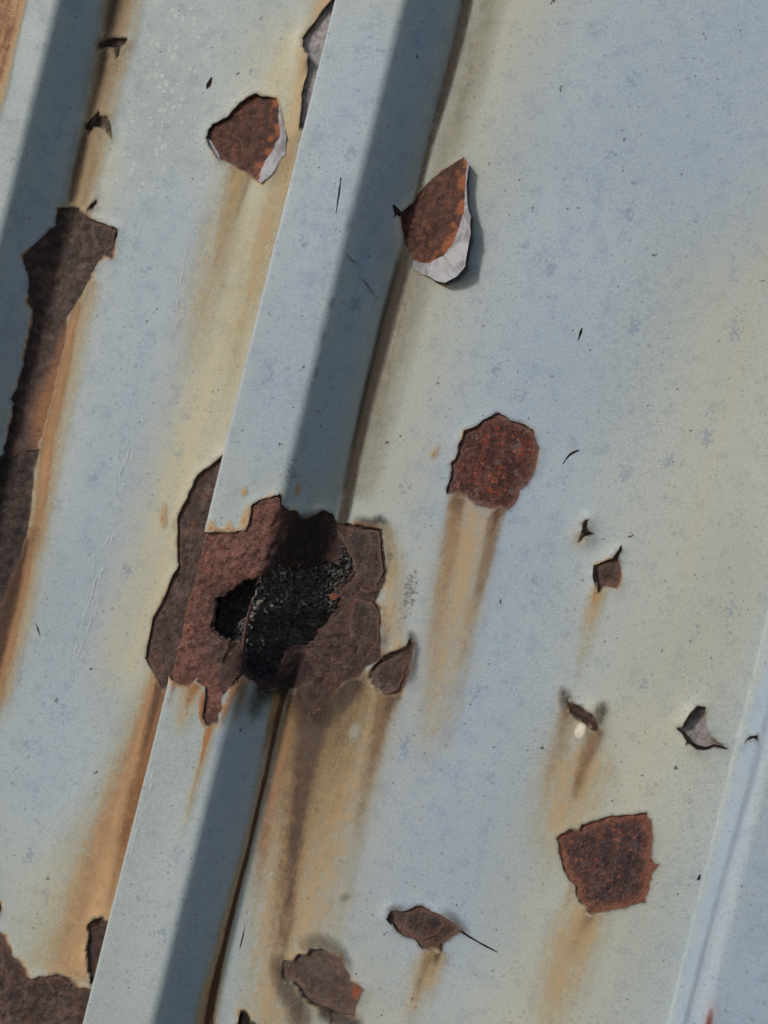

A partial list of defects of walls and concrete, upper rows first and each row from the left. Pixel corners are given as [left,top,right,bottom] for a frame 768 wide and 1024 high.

rust [0,205,118,703]
rust [0,458,413,1024]
rust [427,413,539,718]
rust [540,690,658,1018]
rust [585,545,622,628]